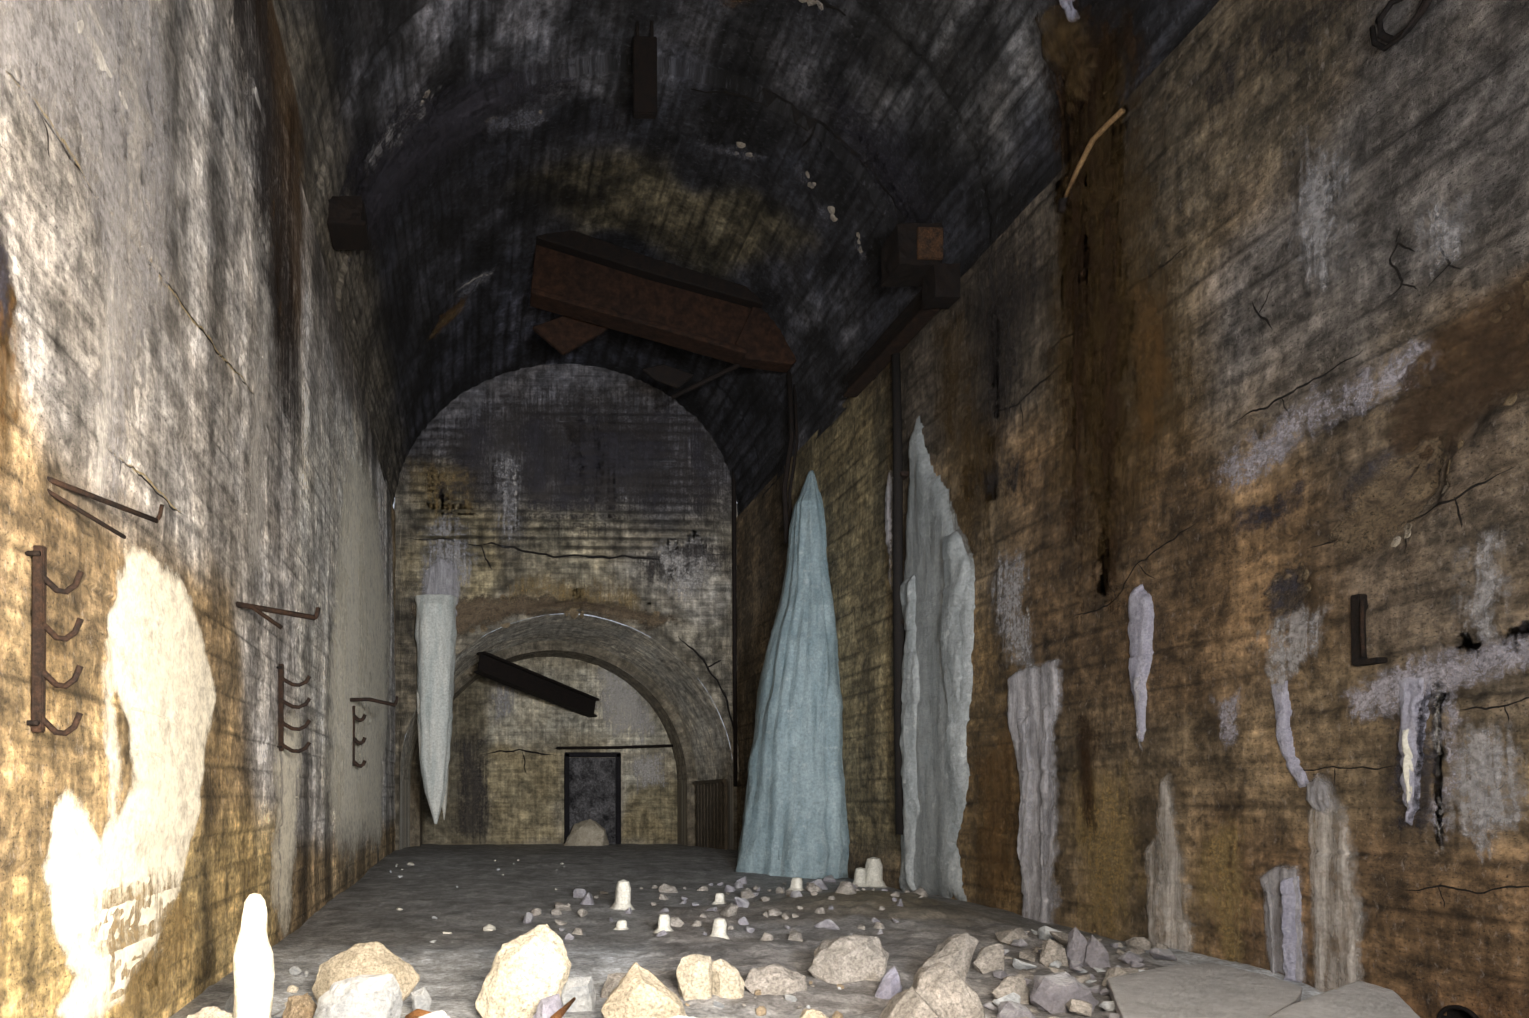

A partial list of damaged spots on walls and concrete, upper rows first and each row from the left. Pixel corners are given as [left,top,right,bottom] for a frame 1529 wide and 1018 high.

water stain [1220,341,1423,488]
water stain [45,547,216,1018]
water stain [1346,536,1529,860]